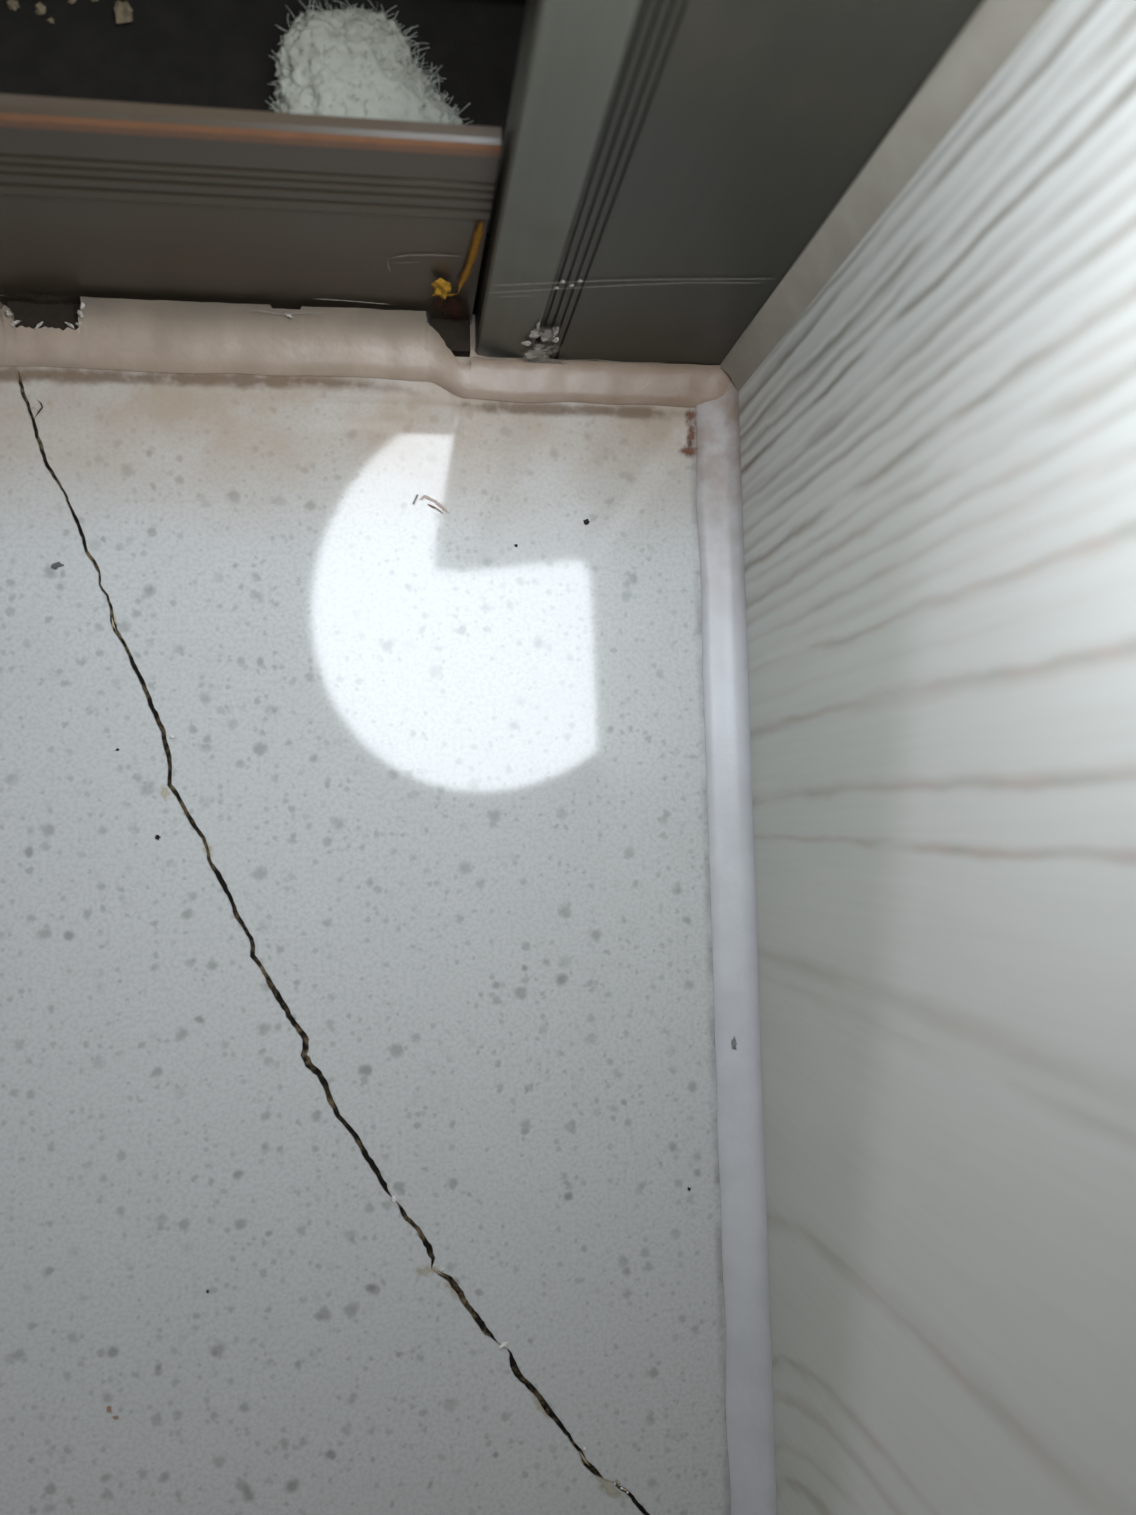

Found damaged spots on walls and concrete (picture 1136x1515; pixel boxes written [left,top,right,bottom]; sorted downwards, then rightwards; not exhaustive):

crack [18,370,650,1515]